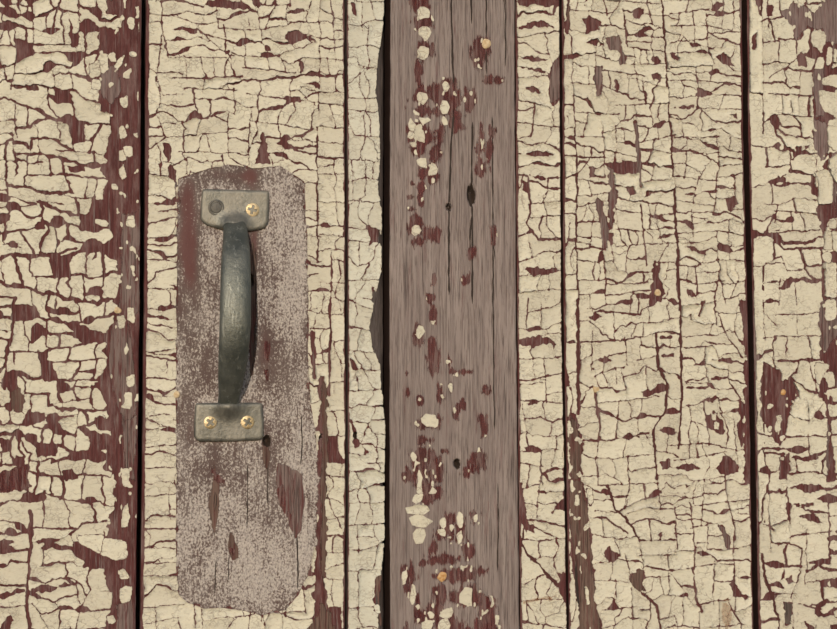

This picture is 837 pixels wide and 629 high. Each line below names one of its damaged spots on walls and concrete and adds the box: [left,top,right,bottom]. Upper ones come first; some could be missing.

peeling [0,0,385,629]
peeling [405,0,477,250]
peeling [400,273,501,629]
peeling [474,122,497,178]
peeling [469,36,505,85]
crack [520,530,580,607]
crack [574,126,603,412]
crack [608,488,673,541]
crack [623,0,714,480]
peeling [516,0,837,629]
crack [762,266,778,474]
crack [762,557,793,629]